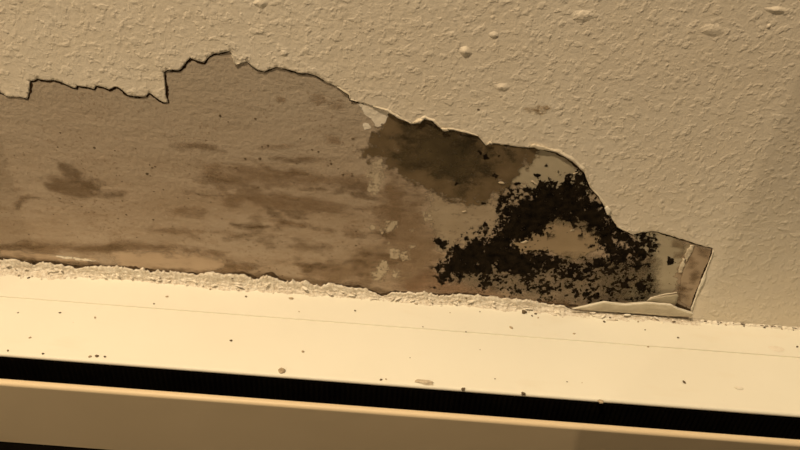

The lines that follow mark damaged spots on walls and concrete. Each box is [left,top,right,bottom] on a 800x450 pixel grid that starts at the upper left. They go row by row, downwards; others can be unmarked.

peeling [0,51,714,324]
damp [361,113,659,304]